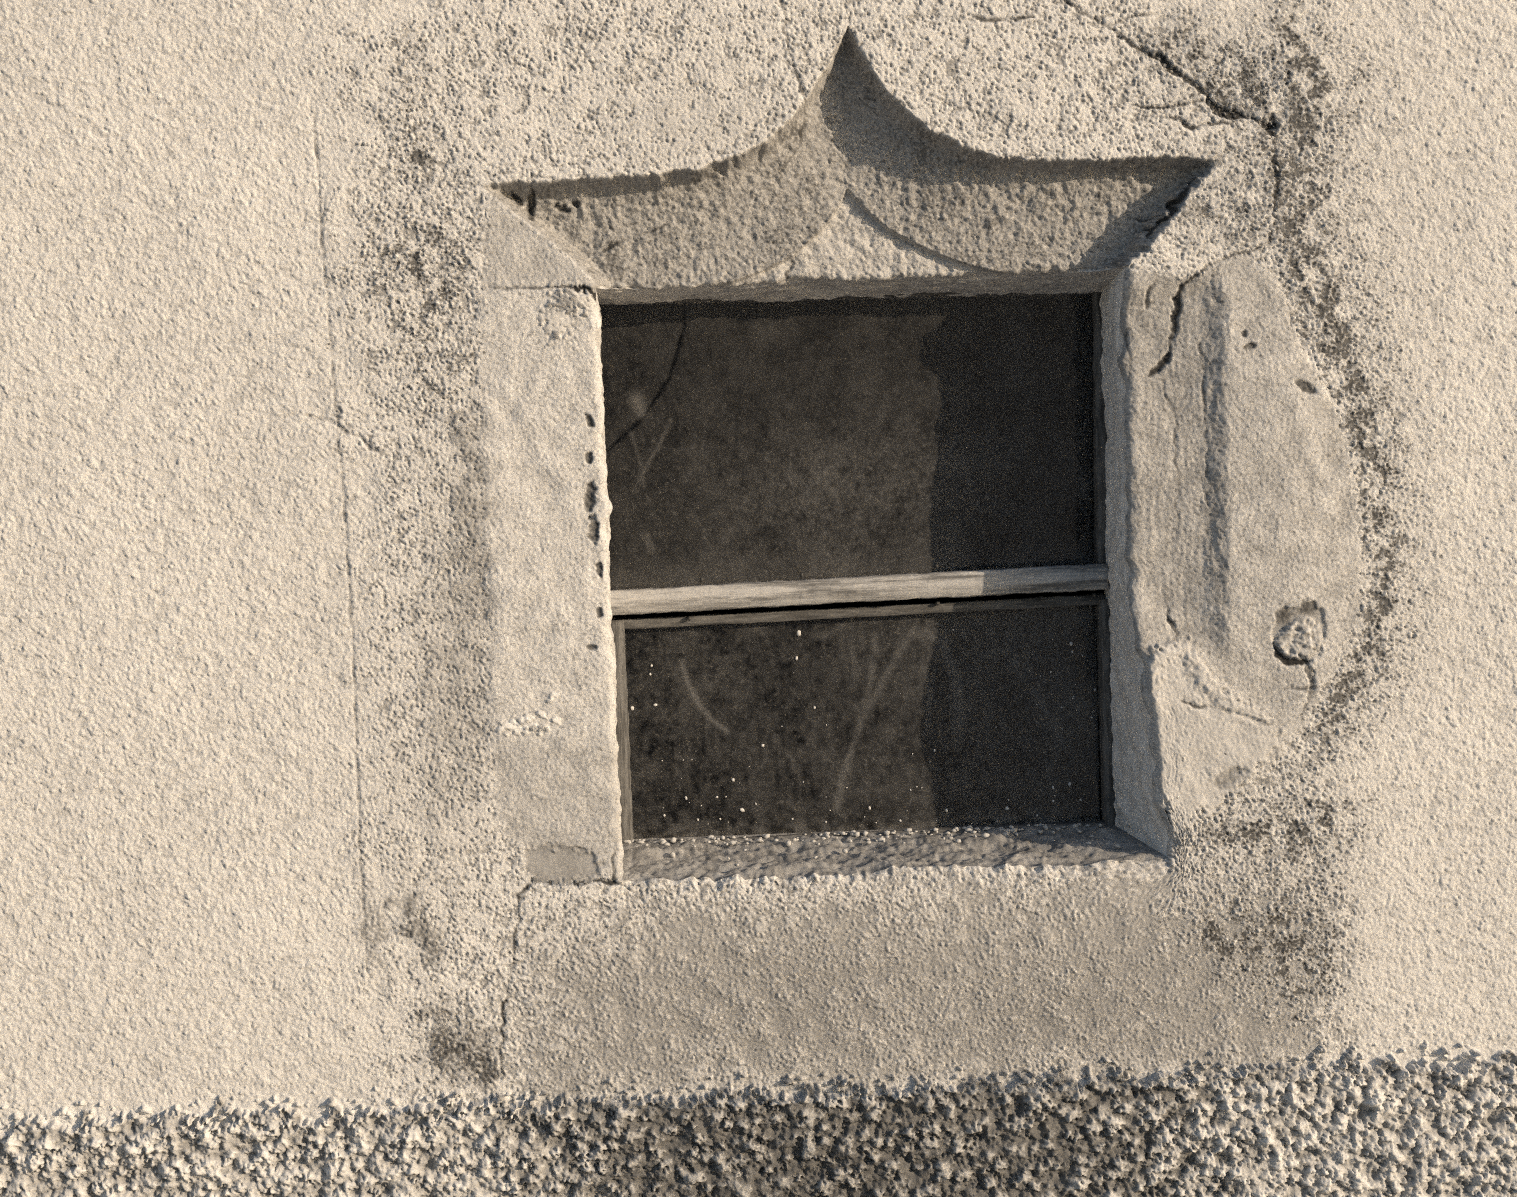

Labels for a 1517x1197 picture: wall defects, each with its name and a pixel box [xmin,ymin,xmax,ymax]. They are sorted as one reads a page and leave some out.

crack [976,14,1031,22]
crack [1121,14,1280,400]
flaking render [1136,0,1449,1033]
crack [500,856,621,1064]
water stain [1122,874,1255,1031]